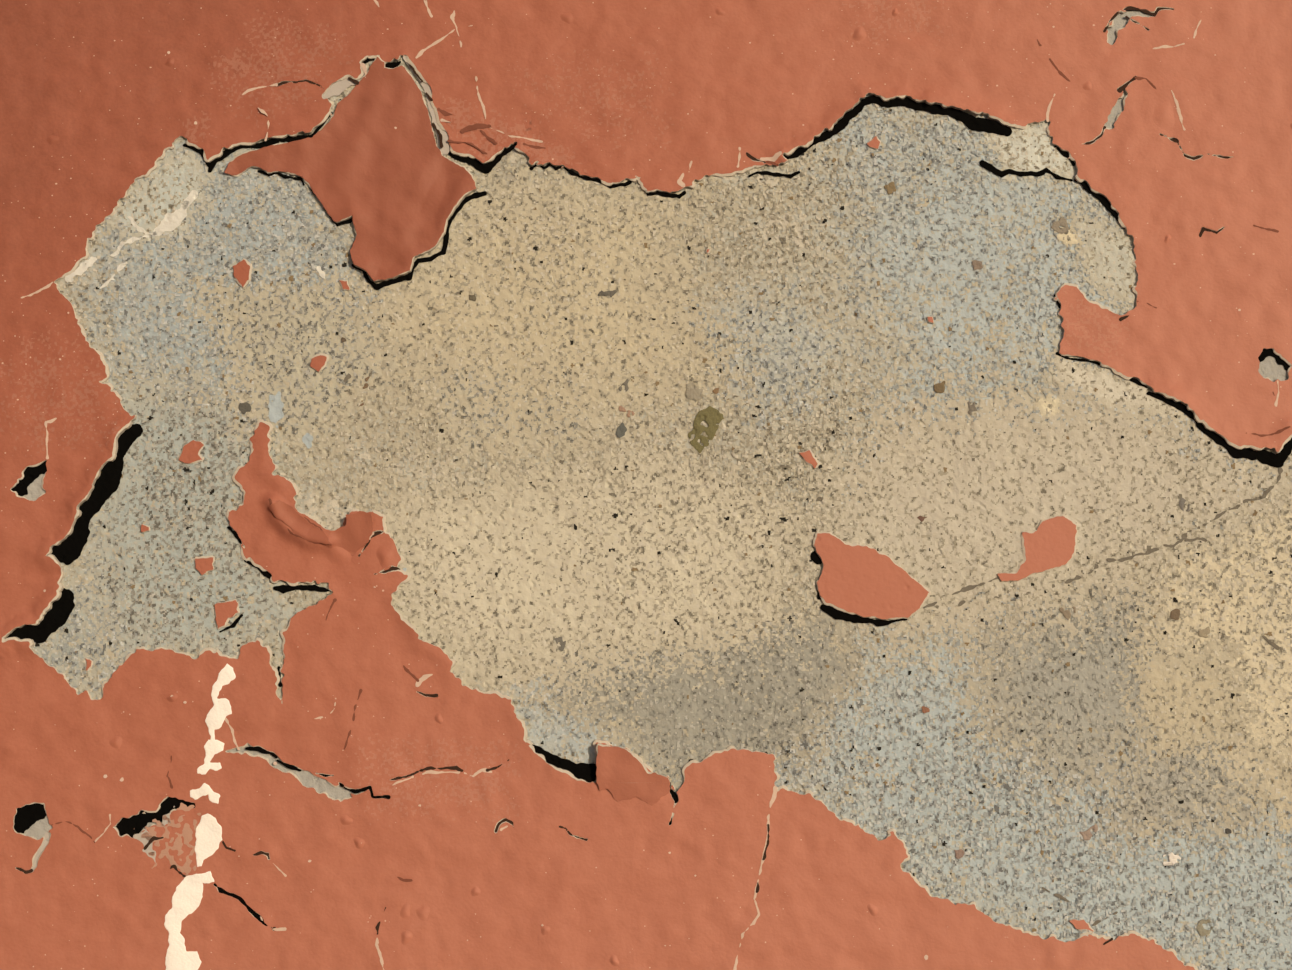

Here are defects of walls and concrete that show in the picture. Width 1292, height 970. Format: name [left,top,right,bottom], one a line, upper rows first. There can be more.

spalling [1103,6,1173,45]
spalling [1082,80,1131,144]
spalling [948,328,1059,397]
spalling [1258,348,1292,382]
spalling [10,460,47,501]
spalling [225,743,389,802]
crack [224,717,509,799]
spalling [1257,730,1292,794]
spalling [13,802,53,873]
spalling [113,796,196,838]
crack [144,836,287,931]
crack [733,786,778,970]